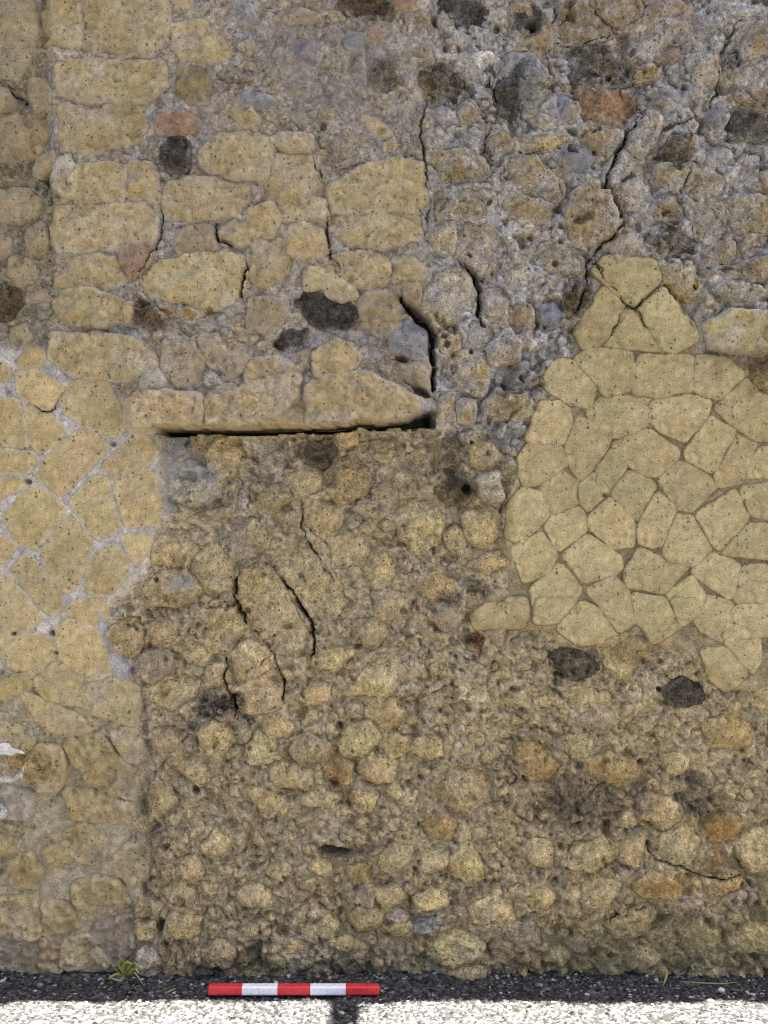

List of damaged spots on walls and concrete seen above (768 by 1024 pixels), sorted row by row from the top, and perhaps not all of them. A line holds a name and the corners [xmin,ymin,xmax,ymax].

crack [575,71,692,335]
crack [168,289,434,438]
crack [464,262,482,327]
crack [224,569,286,721]
crack [283,578,315,657]
crack [645,840,744,880]